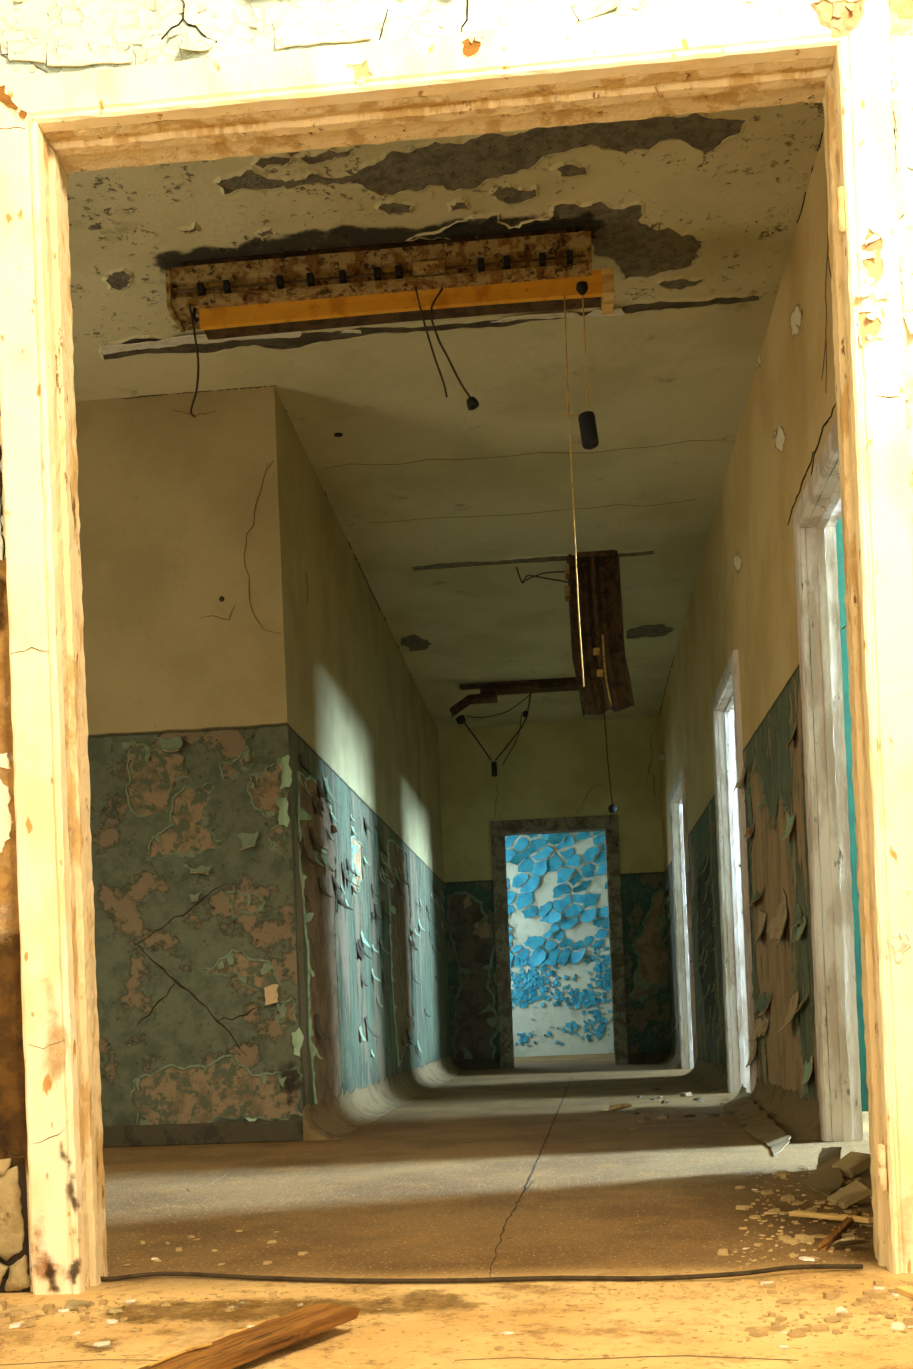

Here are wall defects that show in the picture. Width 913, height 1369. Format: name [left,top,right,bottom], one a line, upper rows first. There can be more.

crack [0,45,47,73]
crack [161,0,217,42]
peeling [0,0,776,122]
crack [461,0,469,33]
spalling [98,112,764,360]
crack [787,132,836,526]
crack [0,412,8,560]
water stain [0,557,29,1173]
peeling [130,753,446,1125]
peeling [473,821,724,1046]
peeling [733,753,813,1103]
flaking render [0,1158,31,1293]